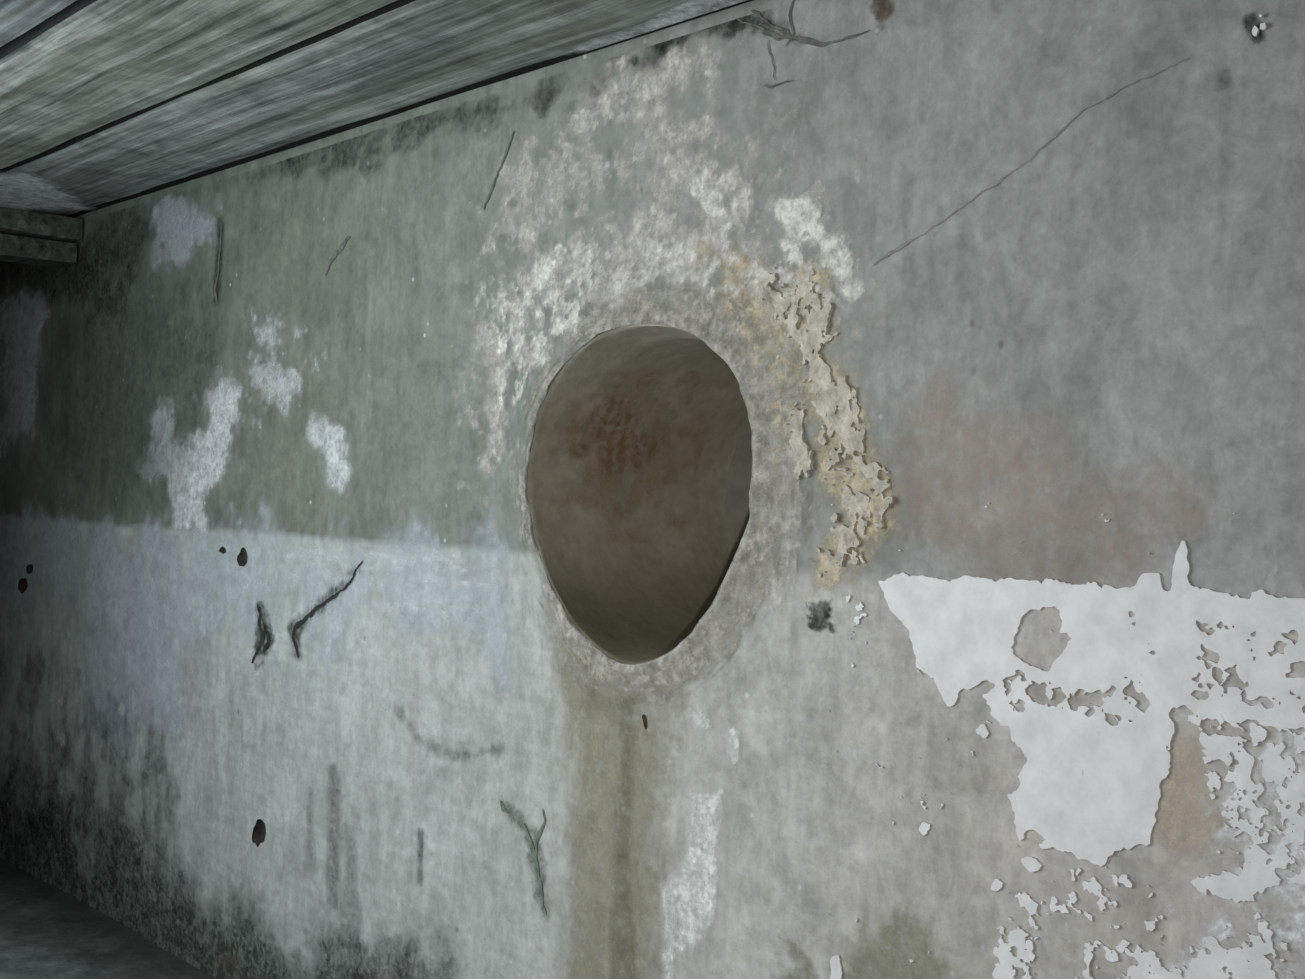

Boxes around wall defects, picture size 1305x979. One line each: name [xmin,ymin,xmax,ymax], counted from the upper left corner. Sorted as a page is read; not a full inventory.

damp [459,44,881,473]
damp [766,392,804,610]
crack [251,561,363,663]
damp [0,760,373,979]
damp [557,644,723,979]
damp [728,728,739,764]
peeling [873,541,1305,979]